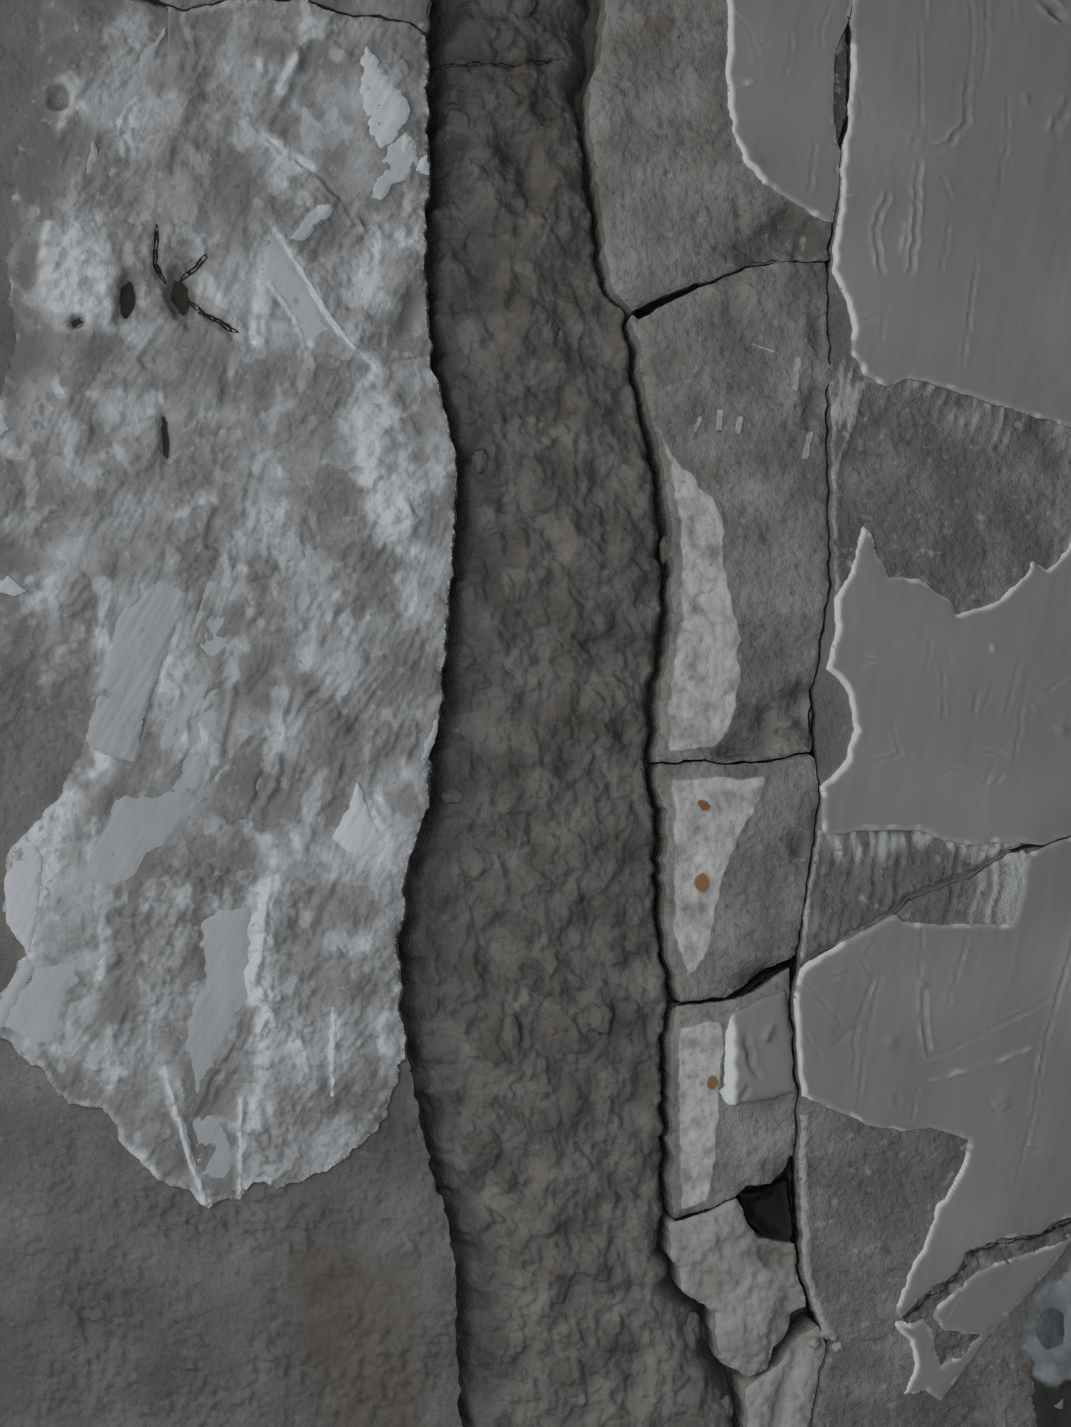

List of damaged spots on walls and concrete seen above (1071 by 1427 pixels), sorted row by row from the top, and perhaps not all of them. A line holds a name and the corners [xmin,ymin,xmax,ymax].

flaking render [360,46,429,200]
crack [833,5,852,167]
spalling [153,224,238,333]
crack [634,229,832,315]
flaking render [828,353,1071,614]
flaking render [0,684,221,1044]
flaking render [185,907,252,1093]
corrosion [695,873,708,892]
crack [656,547,1071,1319]
flaking render [800,830,1027,962]
corrosion [707,1076,718,1089]
leakage [1030,1360,1071,1427]